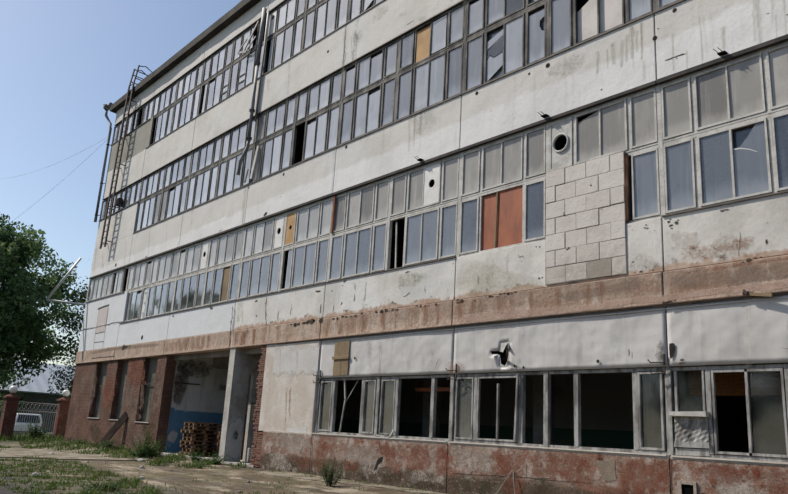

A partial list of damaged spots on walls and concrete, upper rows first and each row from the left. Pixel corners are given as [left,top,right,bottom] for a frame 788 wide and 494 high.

spalling [268,426,400,484]
spalling [406,445,670,494]
spalling [701,464,788,494]